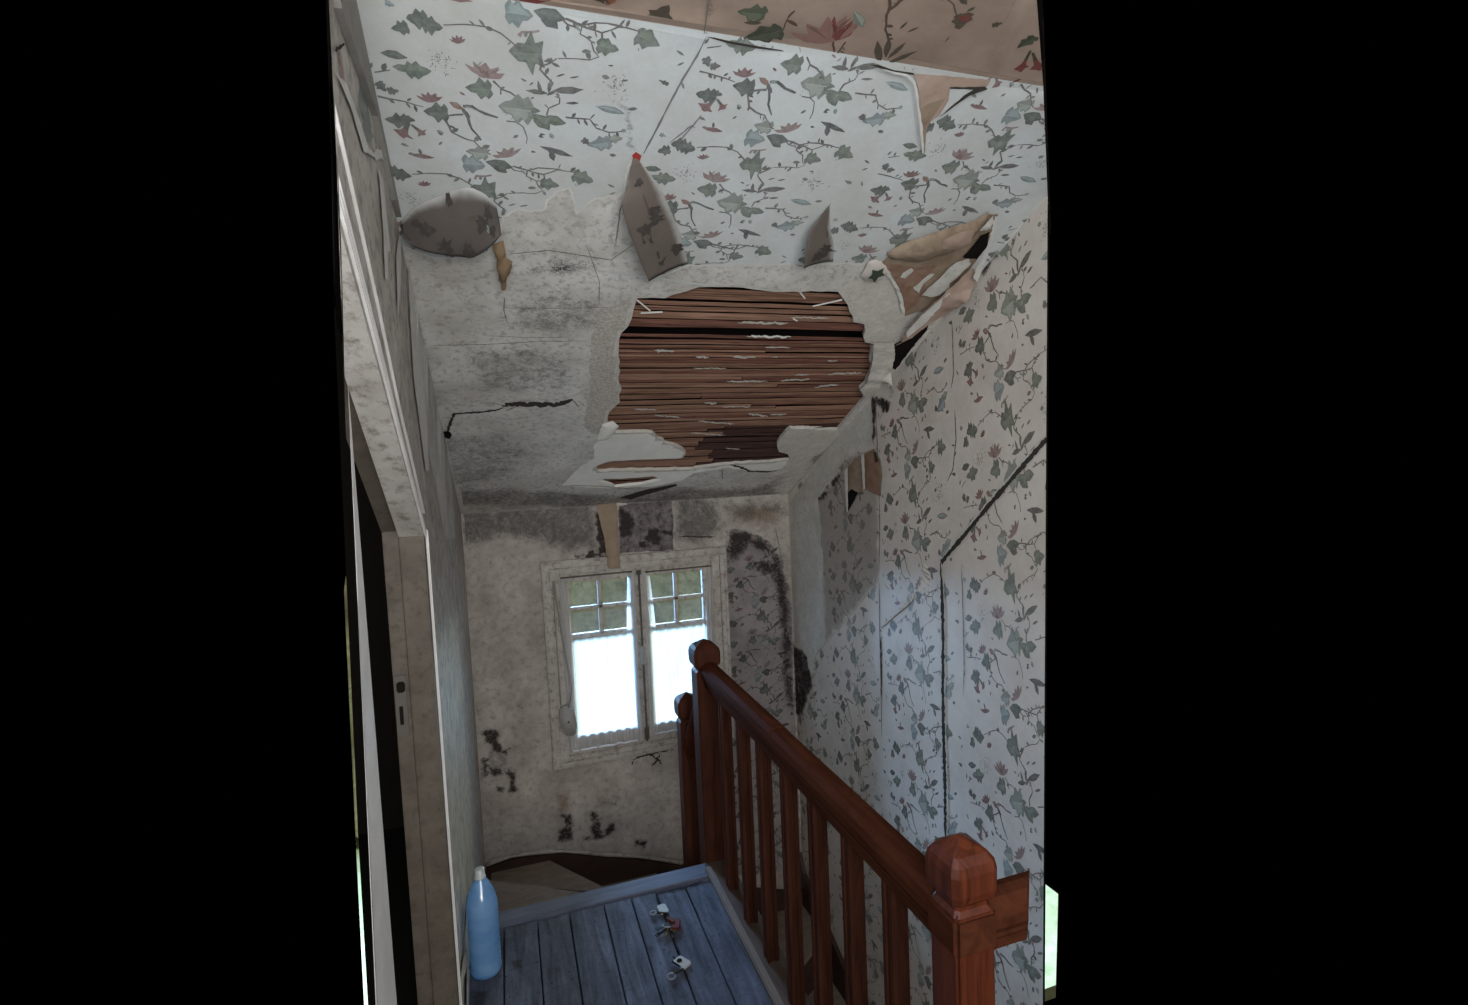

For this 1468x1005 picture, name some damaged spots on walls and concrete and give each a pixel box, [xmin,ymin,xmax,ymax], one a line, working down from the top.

flaking render [337,73,943,683]
crack [427,399,579,523]
leakage [463,484,812,737]
leakage [481,729,516,792]
leakage [732,720,802,875]